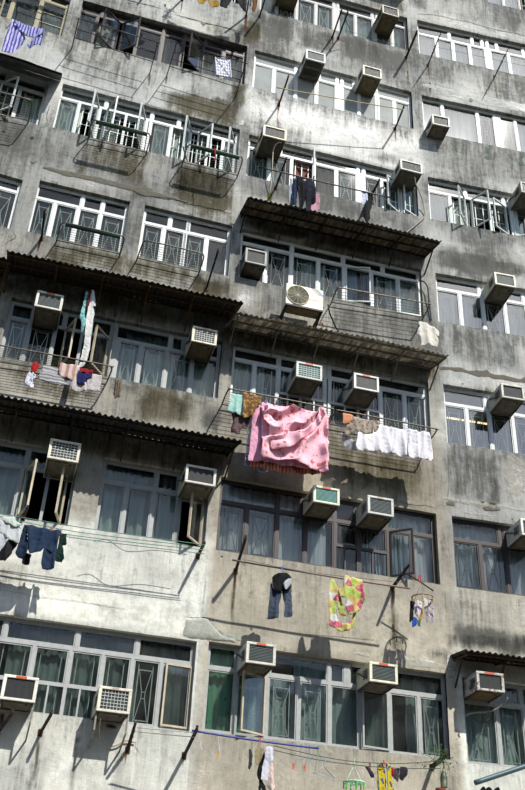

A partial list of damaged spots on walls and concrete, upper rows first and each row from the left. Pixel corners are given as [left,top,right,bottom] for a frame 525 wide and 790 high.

flaking render [31,160,188,210]
flaking render [440,366,525,383]